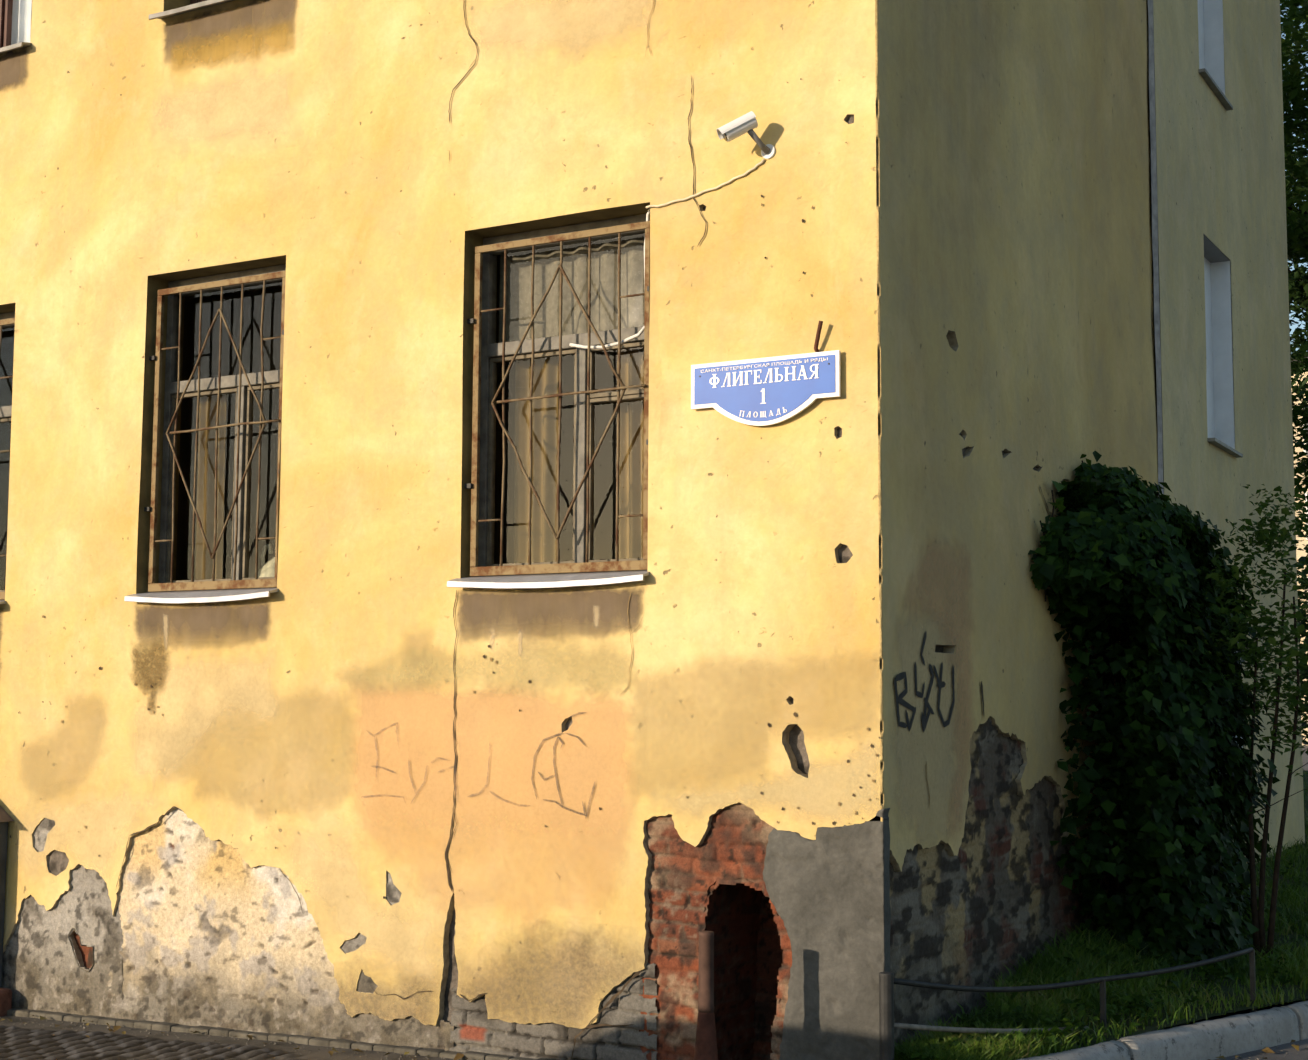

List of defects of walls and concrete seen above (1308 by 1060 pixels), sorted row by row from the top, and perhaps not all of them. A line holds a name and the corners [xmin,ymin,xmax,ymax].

crack [449,0,478,159]
crack [688,78,707,247]
spalling [835,543,853,563]
water stain [133,603,269,771]
flaking render [0,802,799,1060]
crack [370,590,486,1028]
spalling [756,696,810,778]
flaking render [889,716,1132,1050]